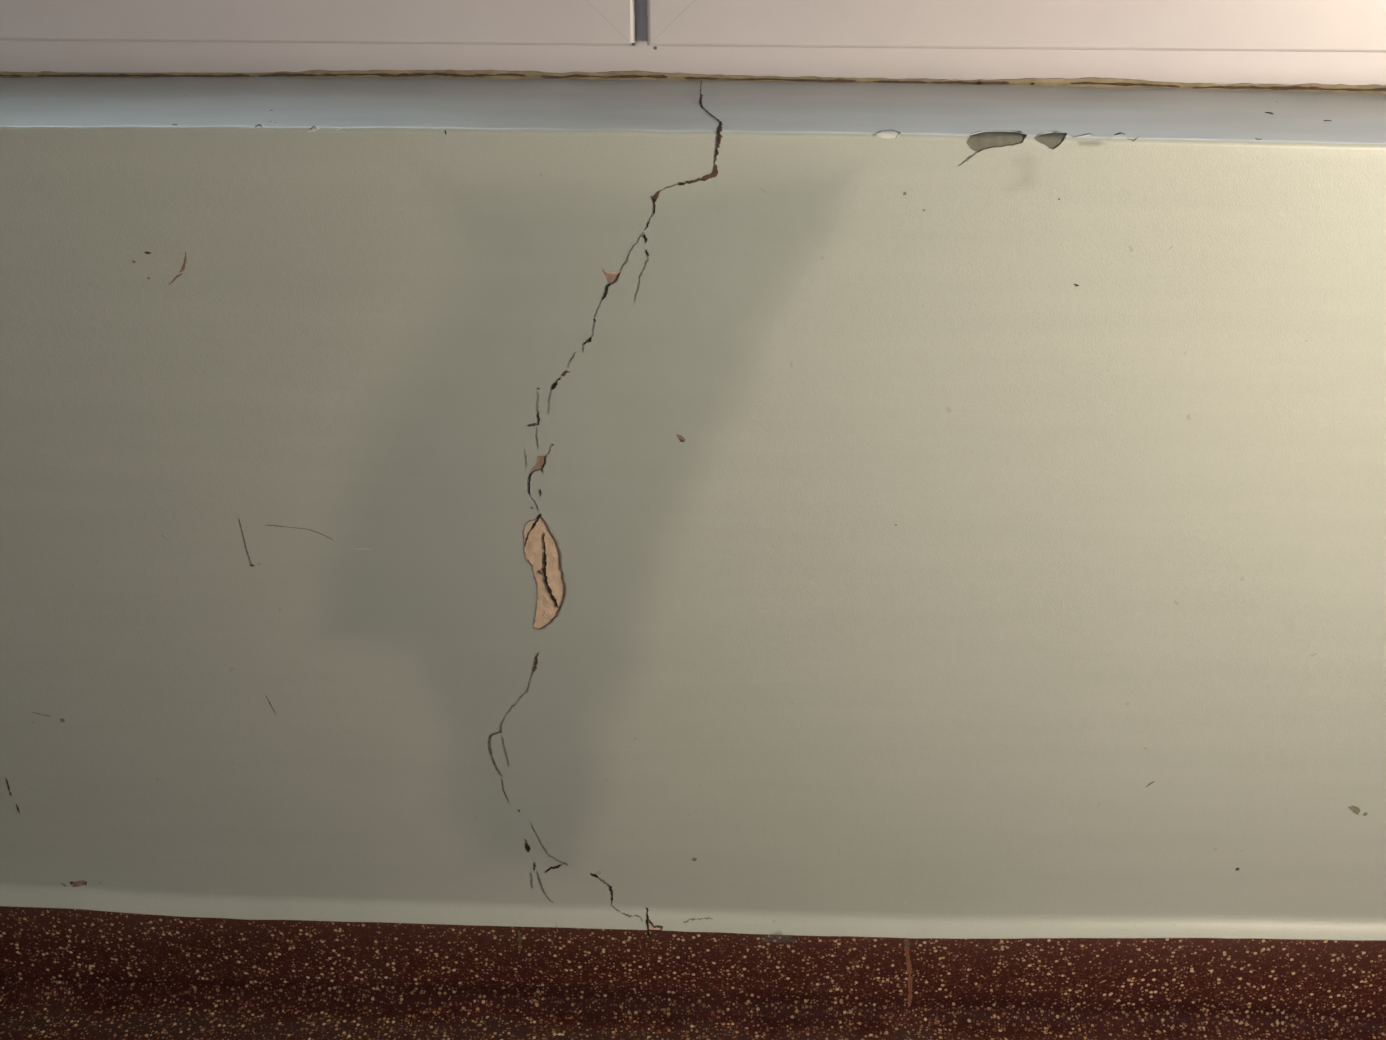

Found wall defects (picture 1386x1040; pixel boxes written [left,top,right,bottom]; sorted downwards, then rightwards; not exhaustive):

spalling [959,130,1139,166]
crack [525,79,723,527]
flaking render [523,516,567,631]
crack [488,652,650,939]